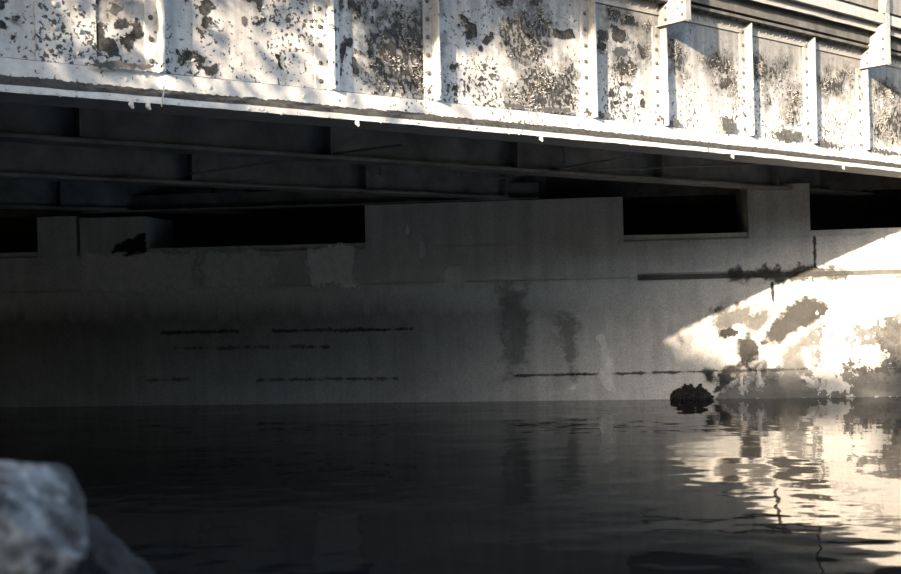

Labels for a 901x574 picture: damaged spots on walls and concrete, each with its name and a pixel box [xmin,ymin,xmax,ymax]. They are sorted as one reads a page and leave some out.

peeling [85,0,143,57]
peeling [176,48,219,76]
peeling [185,0,216,36]
peeling [241,0,267,27]
peeling [339,0,428,97]
peeling [447,63,498,93]
peeling [458,0,579,116]
peeling [597,5,651,108]
peeling [753,48,803,129]
water stain [712,302,768,334]
water stain [796,252,901,398]
water stain [730,342,783,396]